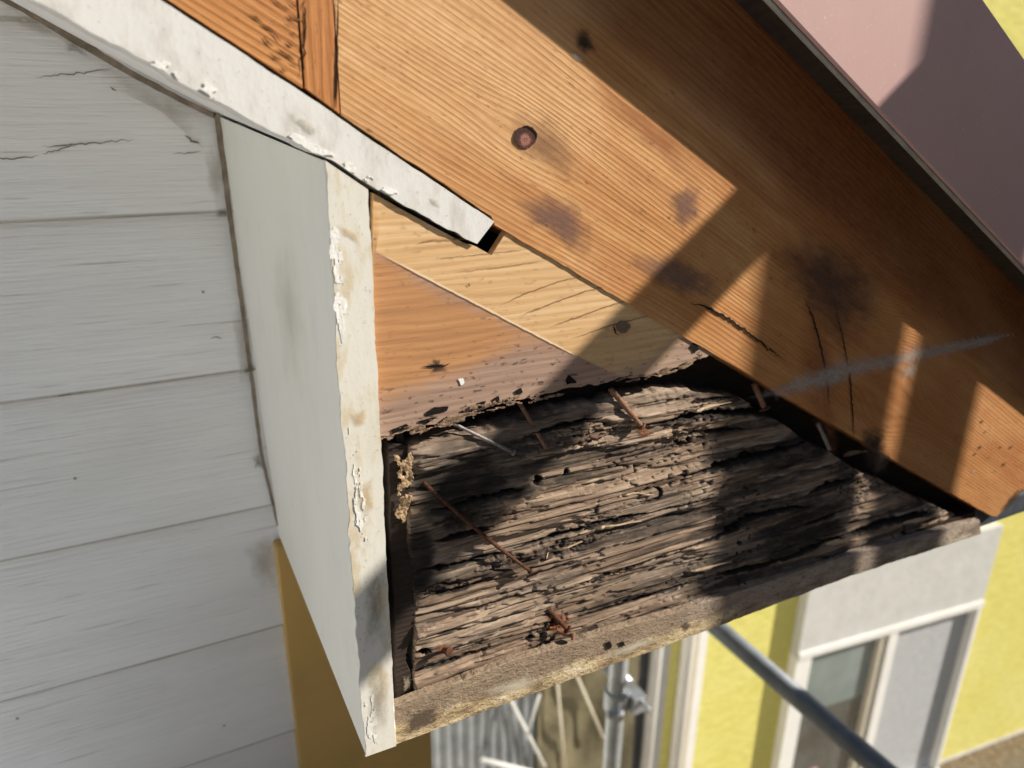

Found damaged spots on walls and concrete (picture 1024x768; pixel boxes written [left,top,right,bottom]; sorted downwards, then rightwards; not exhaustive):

crack [37,67,116,91]
peeling [151,59,179,78]
peeling [200,82,218,98]
crack [0,139,132,160]
peeling [289,133,398,195]
peeling [329,227,347,343]
crack [690,302,785,361]
crack [803,294,854,436]
spalling [390,417,436,434]
peeling [352,464,369,541]